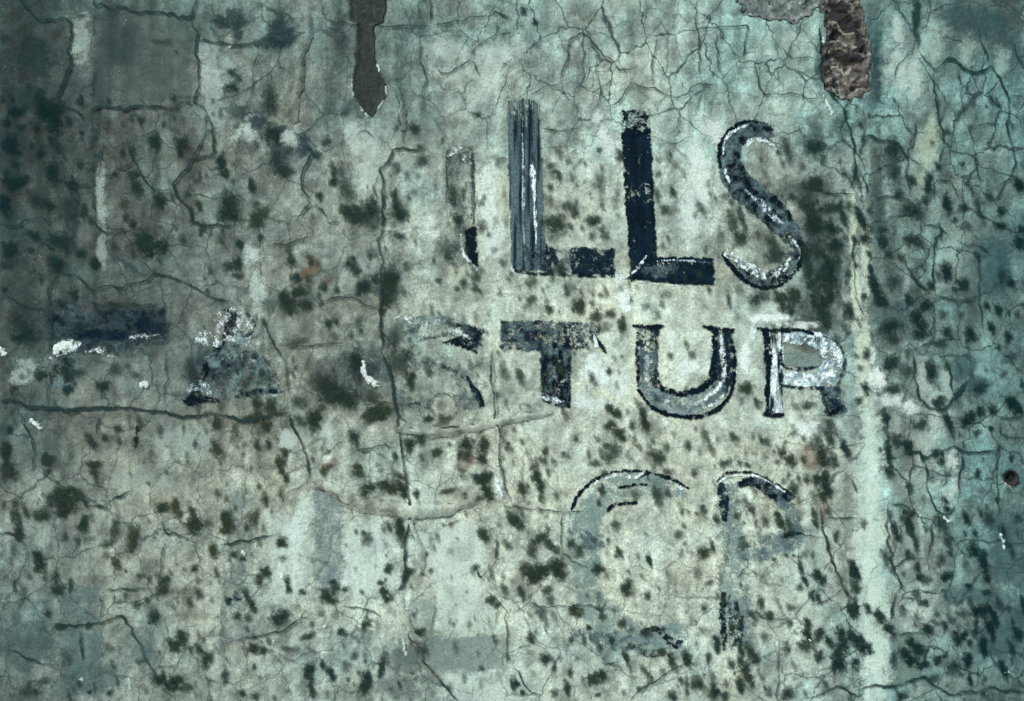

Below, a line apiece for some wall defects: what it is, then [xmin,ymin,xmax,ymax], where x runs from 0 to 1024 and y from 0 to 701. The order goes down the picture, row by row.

spalling [348,0,387,117]
spalling [736,0,872,115]
crack [0,0,348,505]
crack [326,4,580,593]
crack [534,0,1024,700]
water stain [738,138,1024,701]
crack [55,520,199,678]
water stain [224,499,414,669]
water stain [349,431,494,569]
crack [473,540,605,694]
water stain [486,510,593,620]
water stain [568,603,806,701]